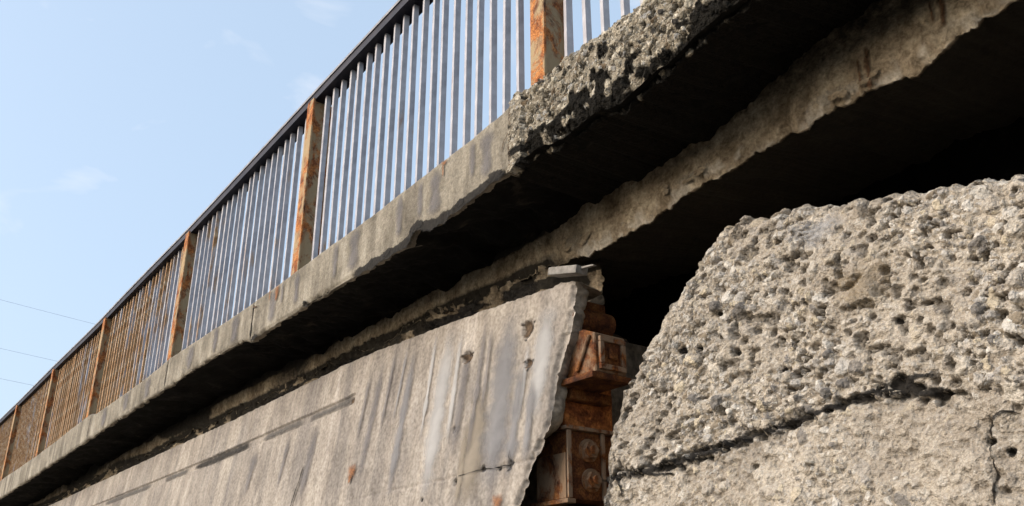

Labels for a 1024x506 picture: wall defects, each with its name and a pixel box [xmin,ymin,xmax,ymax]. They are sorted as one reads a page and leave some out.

spalling [506,0,879,204]
damp [426,301,489,329]
damp [501,283,536,304]
damp [358,358,412,480]
damp [422,322,551,498]
crack [603,373,954,497]
crack [989,410,1014,504]